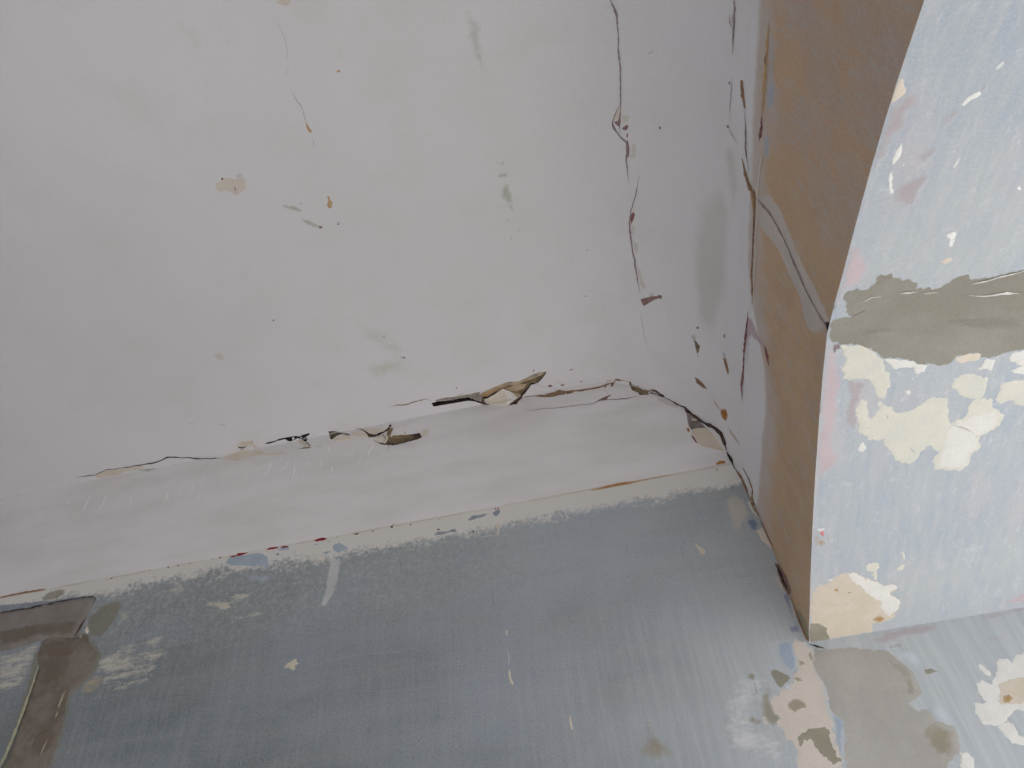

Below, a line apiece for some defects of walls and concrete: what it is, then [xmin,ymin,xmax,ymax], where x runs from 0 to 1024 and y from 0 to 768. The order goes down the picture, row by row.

crack [728,0,736,54]
crack [610,0,647,290]
crack [726,80,827,394]
flaking render [391,371,546,407]
peeling [834,344,1024,471]
crack [82,440,289,478]
peeling [0,641,41,716]
peeling [748,562,939,768]
peeling [973,652,1024,746]